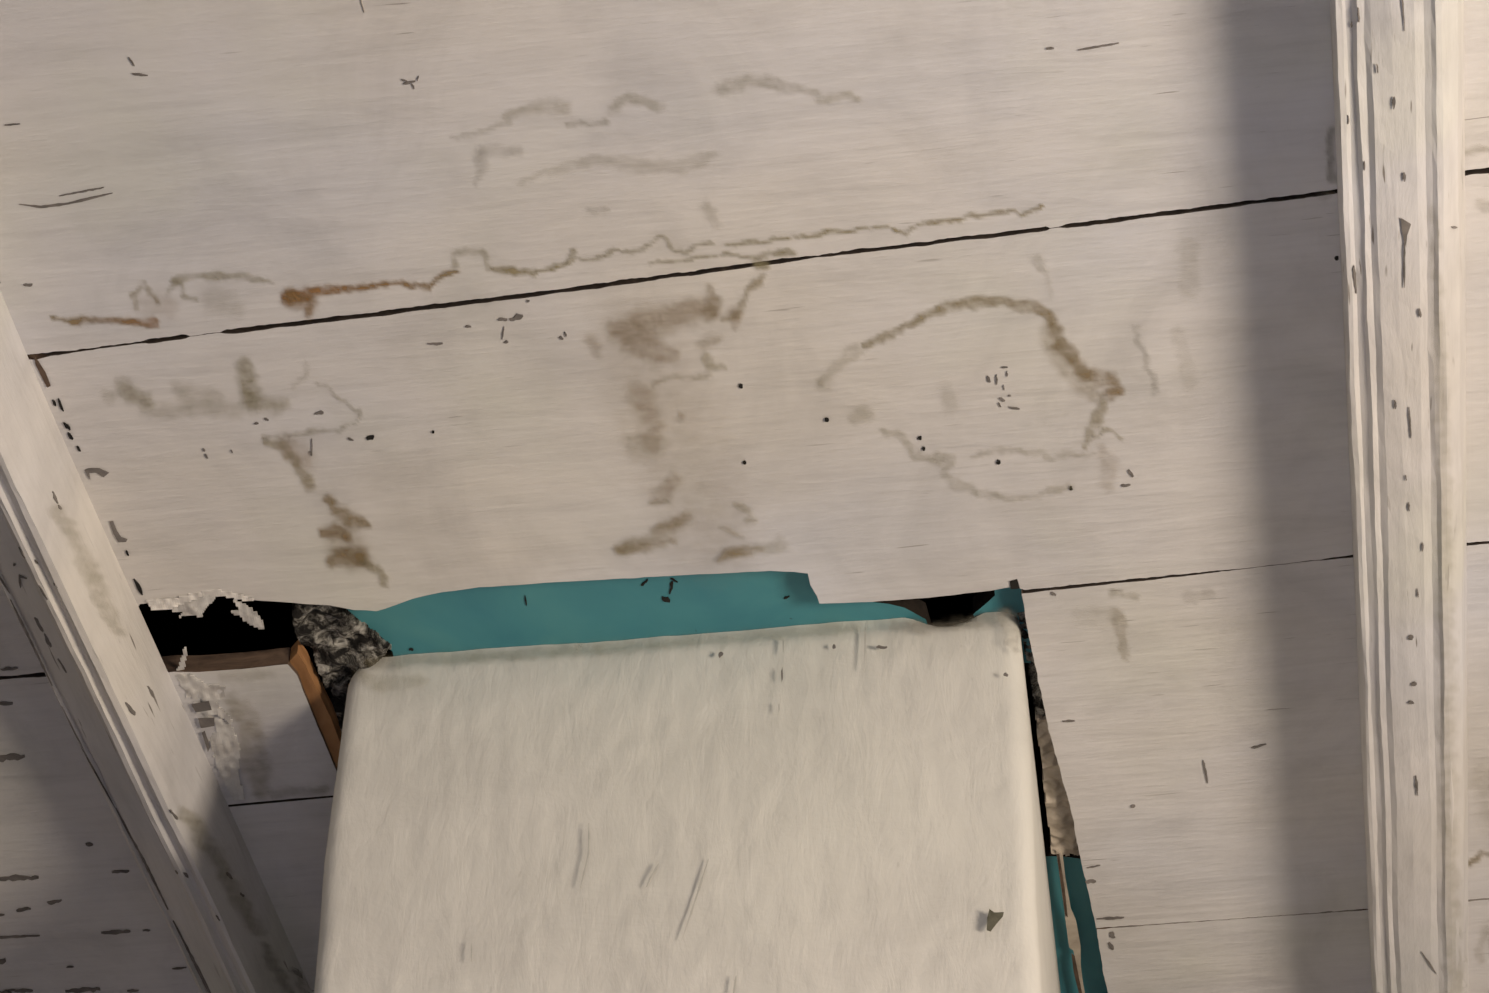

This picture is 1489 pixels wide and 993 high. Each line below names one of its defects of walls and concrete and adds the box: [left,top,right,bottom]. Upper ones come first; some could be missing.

damp [498,261,569,275]
damp [755,228,861,284]
damp [51,316,157,328]
damp [282,271,458,315]
damp [903,298,1014,326]
damp [1038,311,1122,395]
peeling [146,589,264,630]
peeling [1096,916,1124,950]